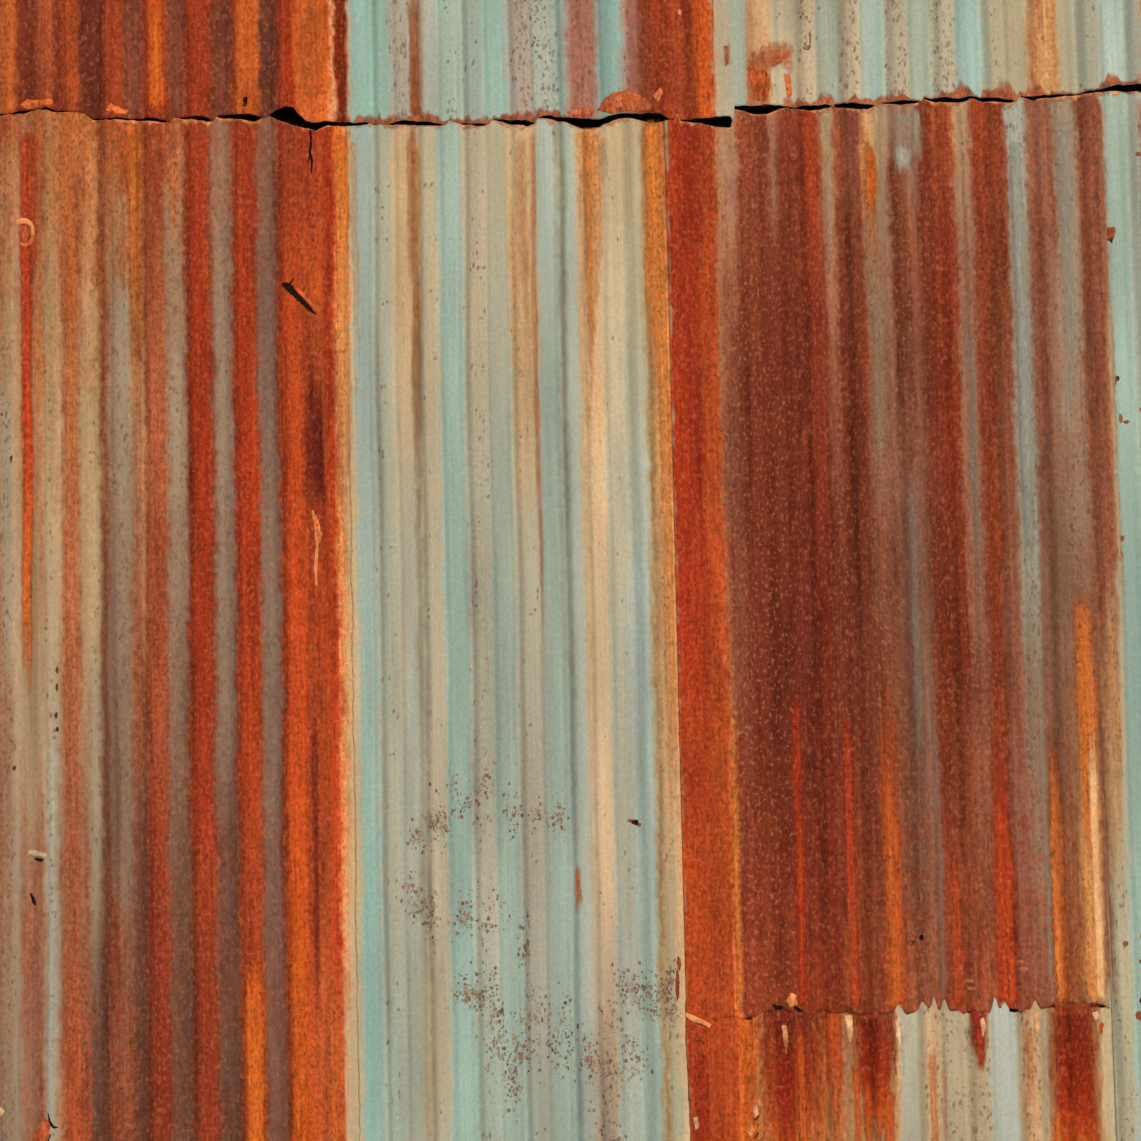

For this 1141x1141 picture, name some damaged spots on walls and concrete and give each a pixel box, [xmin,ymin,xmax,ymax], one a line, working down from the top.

corrosion [20,134,38,670]
corrosion [146,0,165,107]
corrosion [0,99,357,446]
corrosion [355,0,675,758]
crack [0,84,1141,174]
corrosion [675,44,1141,578]
corrosion [244,964,265,1141]
corrosion [290,737,318,1141]
corrosion [400,871,683,1141]
corrosion [745,707,905,1141]
corrosion [993,782,1017,1005]
corrosion [1049,600,1118,1141]